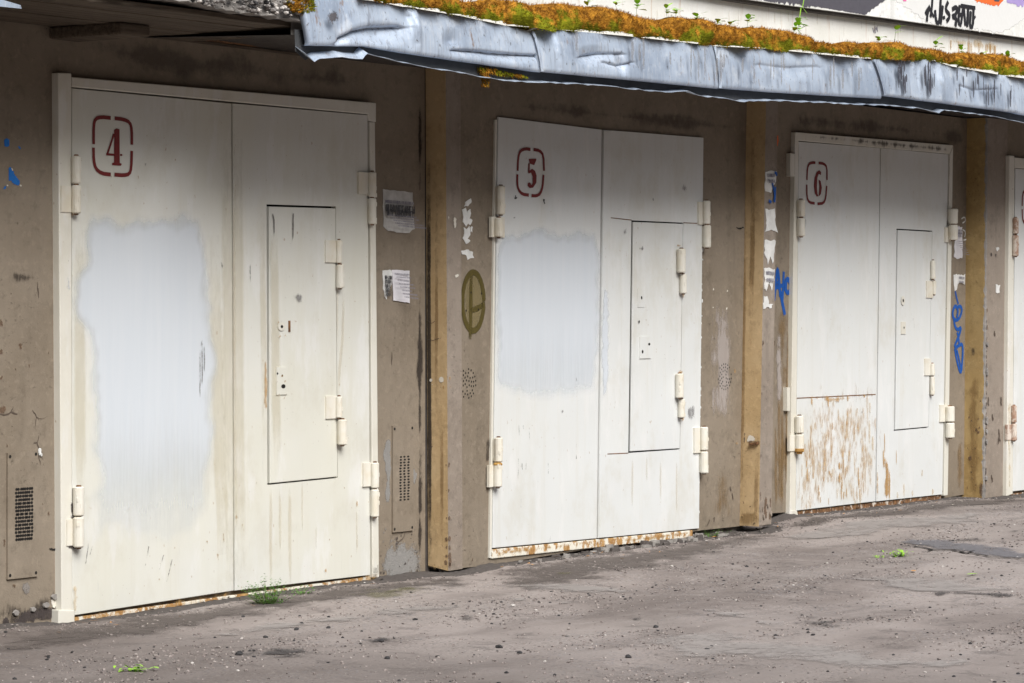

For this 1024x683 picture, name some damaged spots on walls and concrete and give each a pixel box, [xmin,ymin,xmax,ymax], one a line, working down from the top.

rust [795,396,864,502]